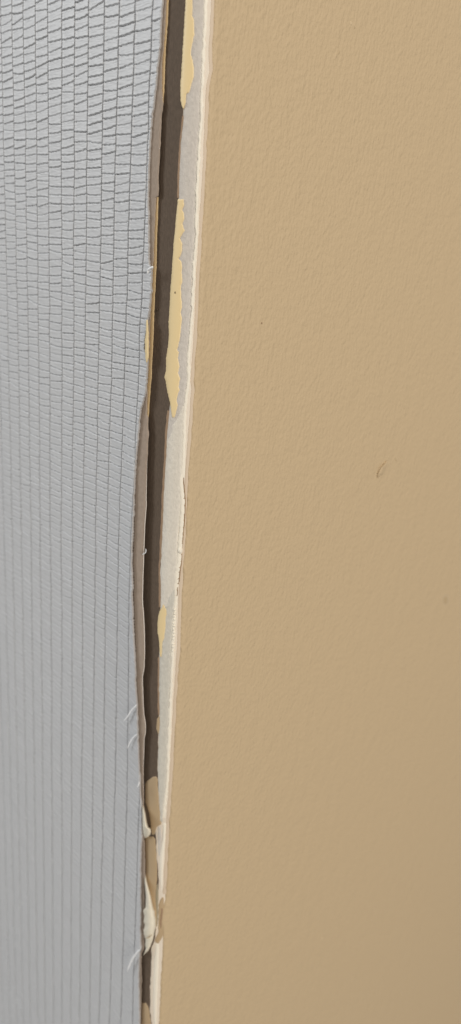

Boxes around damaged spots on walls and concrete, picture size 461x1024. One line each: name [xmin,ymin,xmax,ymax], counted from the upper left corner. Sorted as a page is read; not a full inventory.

flaking render [144,0,204,918]
crack [177,478,186,595]